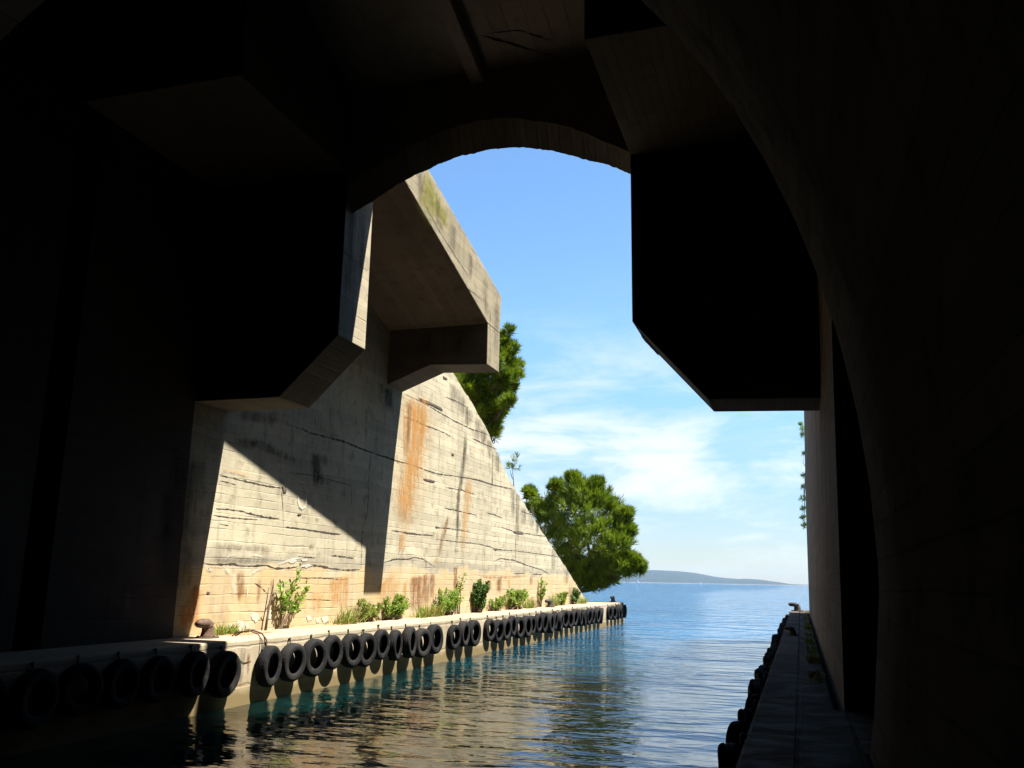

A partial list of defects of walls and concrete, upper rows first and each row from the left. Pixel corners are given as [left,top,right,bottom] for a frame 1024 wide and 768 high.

crack [203,394,559,600]
corrosion [401,405,425,515]
corrosion [405,576,434,607]